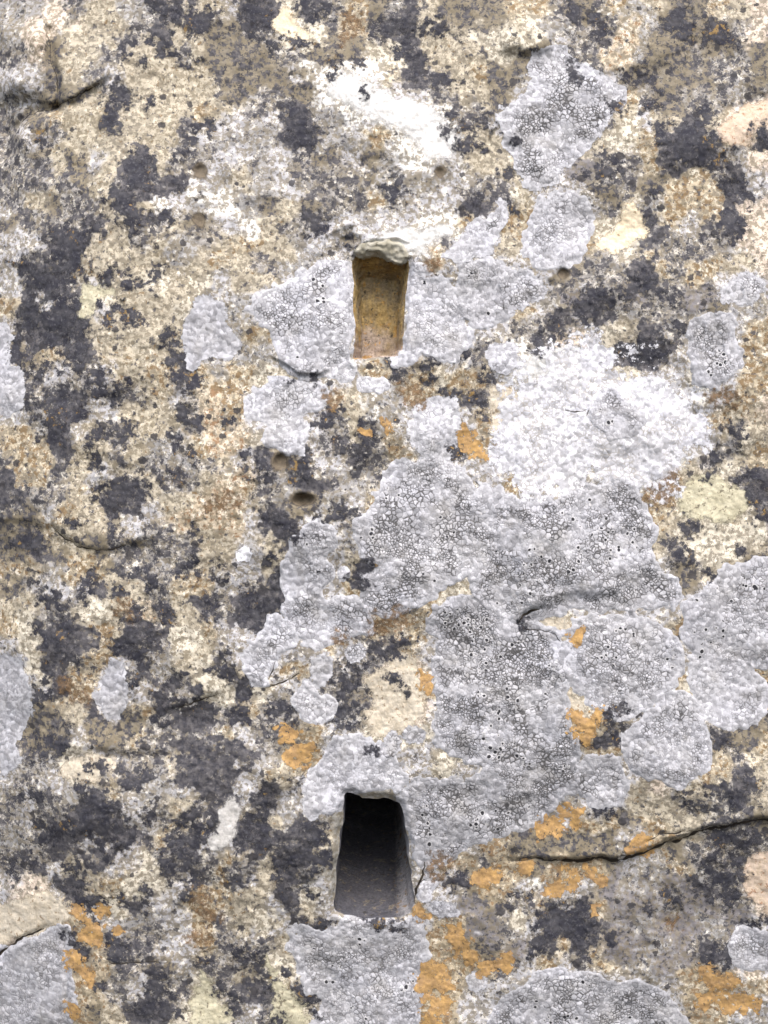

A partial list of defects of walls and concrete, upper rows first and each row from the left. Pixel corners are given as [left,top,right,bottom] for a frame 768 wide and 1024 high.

crack [22,38,98,122]
crack [513,818,768,863]